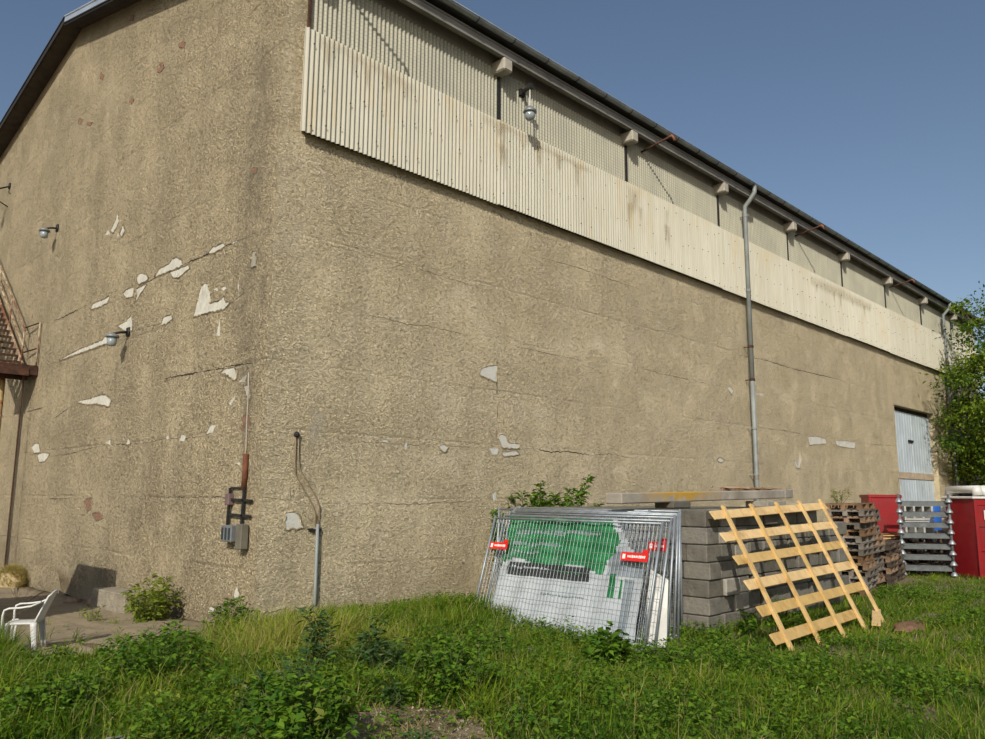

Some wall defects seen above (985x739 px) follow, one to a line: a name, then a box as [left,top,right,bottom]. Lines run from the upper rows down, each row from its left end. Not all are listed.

flaking render [105,208,125,238]
flaking render [90,295,110,311]
flaking render [117,256,191,332]
flaking render [193,281,239,336]
flaking render [59,336,107,362]
crack [165,361,258,382]
flaking render [478,364,498,383]
flaking render [76,393,112,408]
flaking render [31,442,50,463]
flaking render [490,433,520,458]
flaking render [793,435,856,469]
flaking render [283,510,305,532]